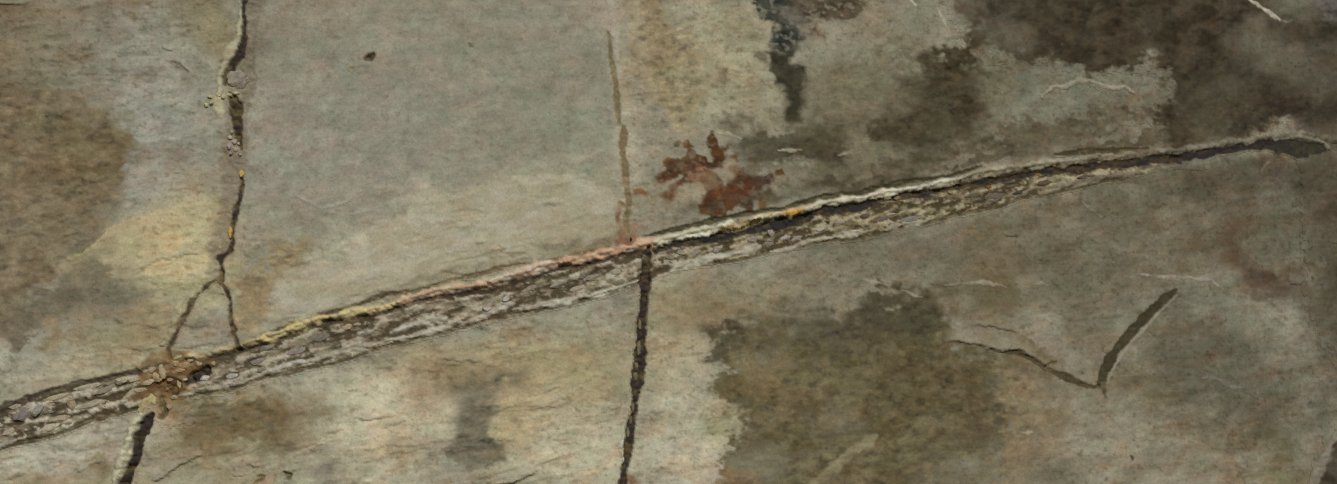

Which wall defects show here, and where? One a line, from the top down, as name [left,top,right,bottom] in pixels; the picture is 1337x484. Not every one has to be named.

crack [159,0,1179,484]
corrosion [616,128,786,245]
water stain [616,0,1337,368]
crack [0,407,155,484]
water stain [387,323,641,471]
water stain [648,271,1079,484]
water stain [1312,439,1337,484]